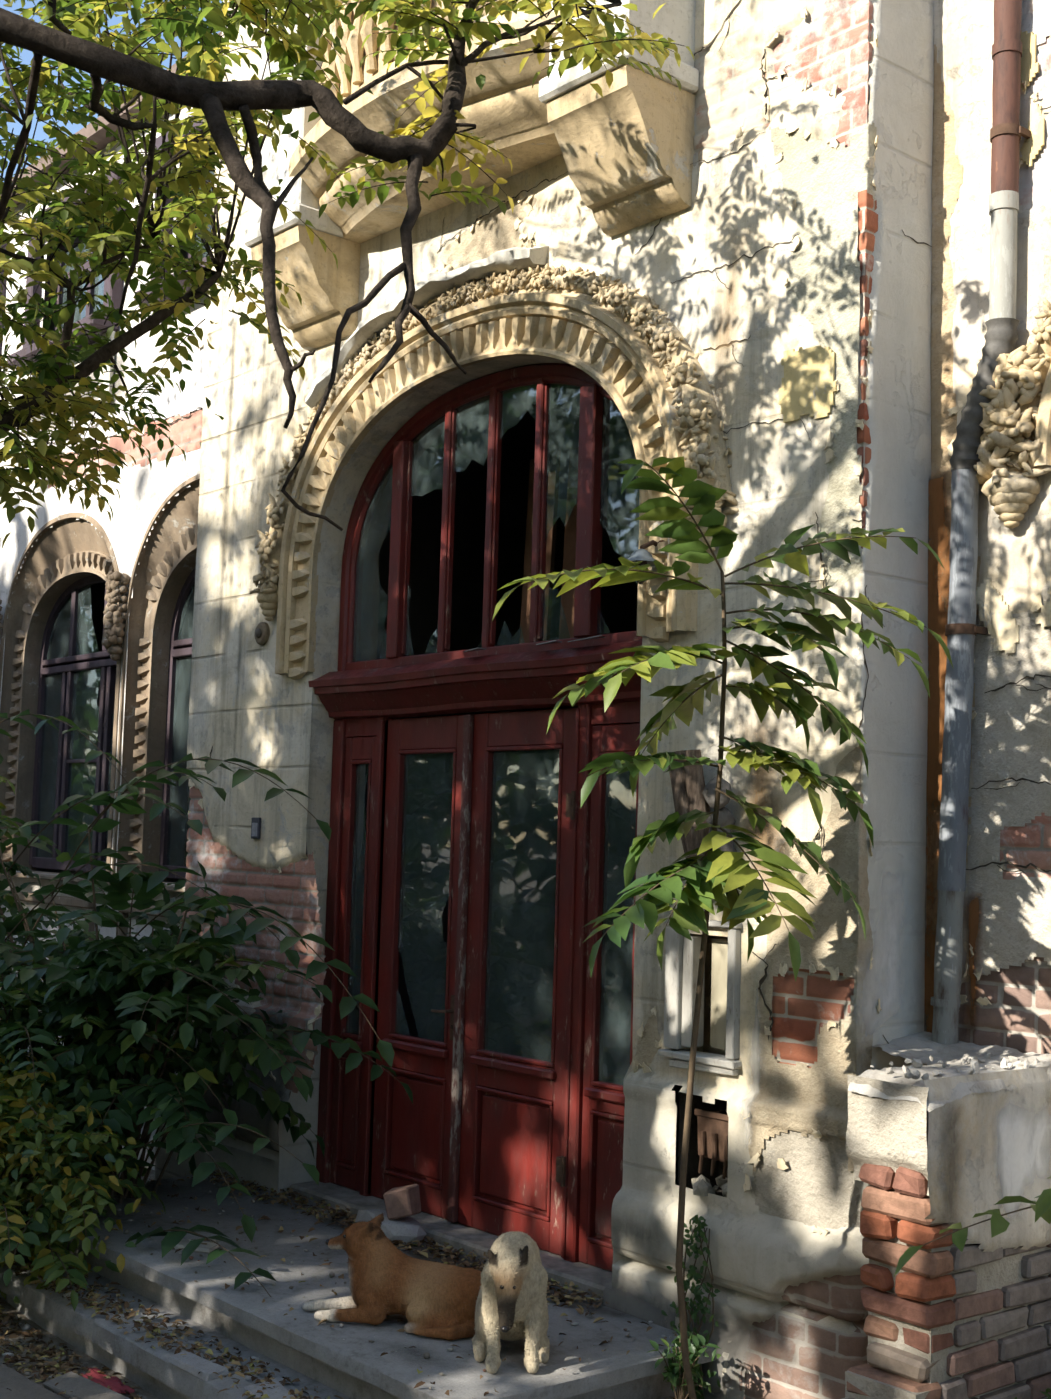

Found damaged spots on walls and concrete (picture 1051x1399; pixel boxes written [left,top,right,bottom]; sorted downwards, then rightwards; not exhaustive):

flaking render [1018,0,1051,210]
crack [670,234,799,290]
spalling [692,0,879,588]
peeling [930,44,963,532]
flaking render [182,779,326,1095]
spalling [678,738,882,1236]
spalling [959,556,1051,1054]
crack [966,861,1051,874]
crack [971,777,1051,790]
crack [985,674,1051,693]
flaking render [739,1275,868,1399]